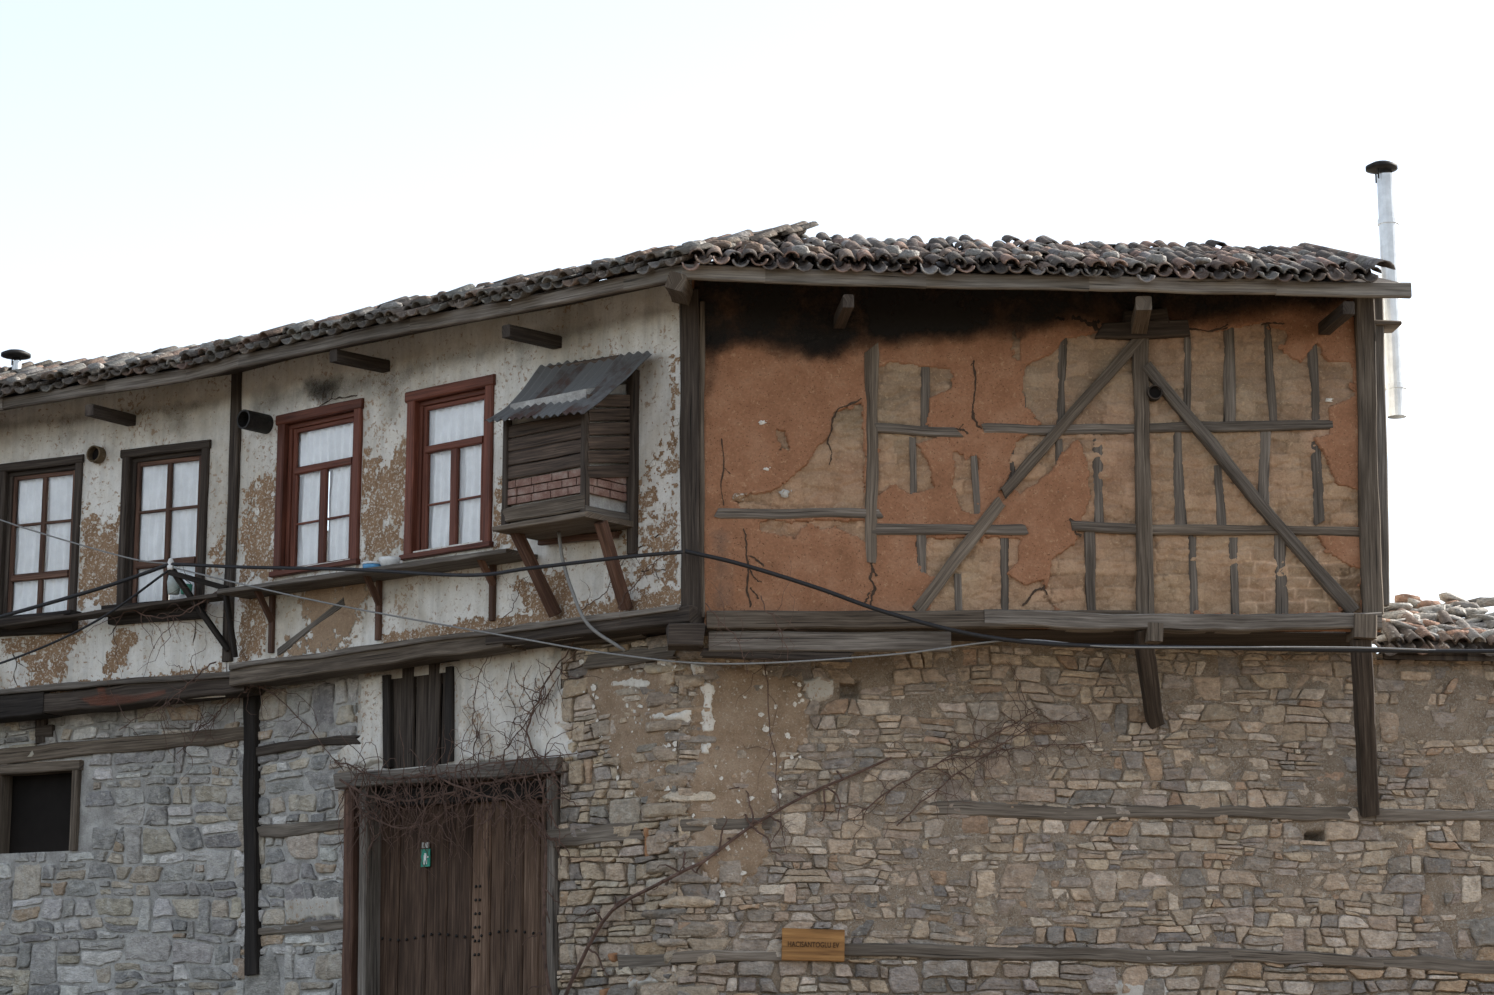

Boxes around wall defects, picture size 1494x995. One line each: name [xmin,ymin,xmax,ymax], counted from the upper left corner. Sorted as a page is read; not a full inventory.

peeling [1,354,681,693]
spalling [732,362,958,542]
spalling [926,323,1362,614]
flaking render [458,647,584,764]
flaking render [583,663,727,795]
peeling [736,670,812,803]